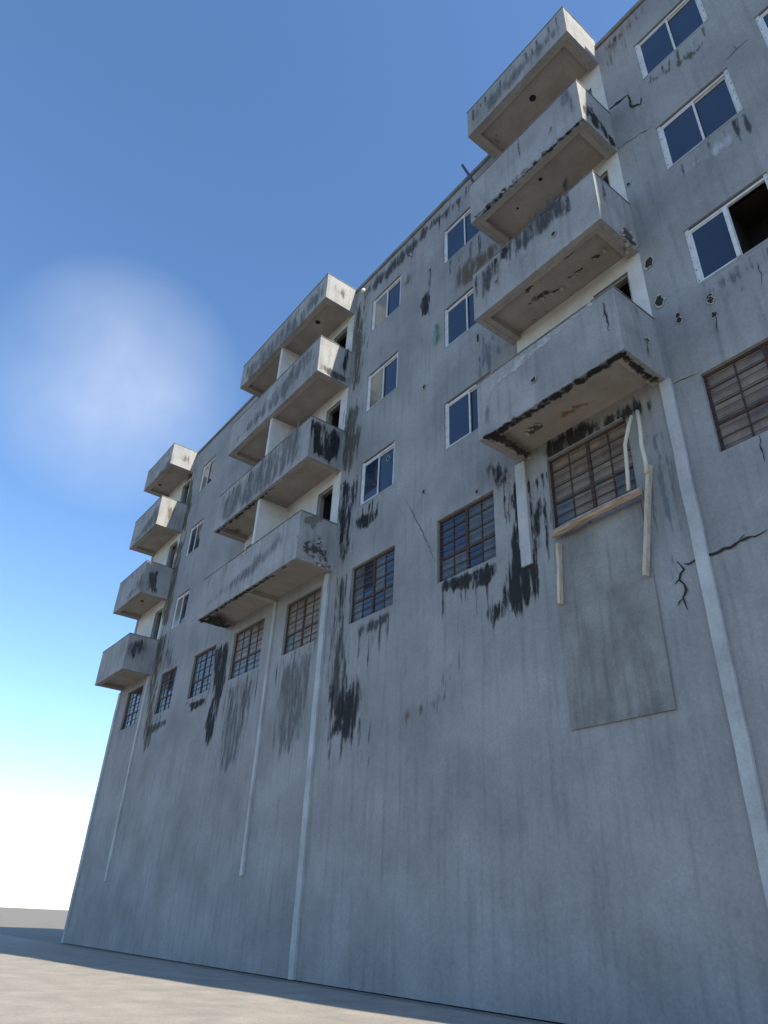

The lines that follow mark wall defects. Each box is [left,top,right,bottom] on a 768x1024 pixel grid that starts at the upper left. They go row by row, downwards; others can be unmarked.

crack [588,94,653,149]
spalling [653,293,666,308]
spalling [706,292,718,319]
peeling [297,515,331,570]
water stain [442,563,494,613]
water stain [530,501,552,548]
crack [675,529,768,610]
water stain [186,642,258,769]